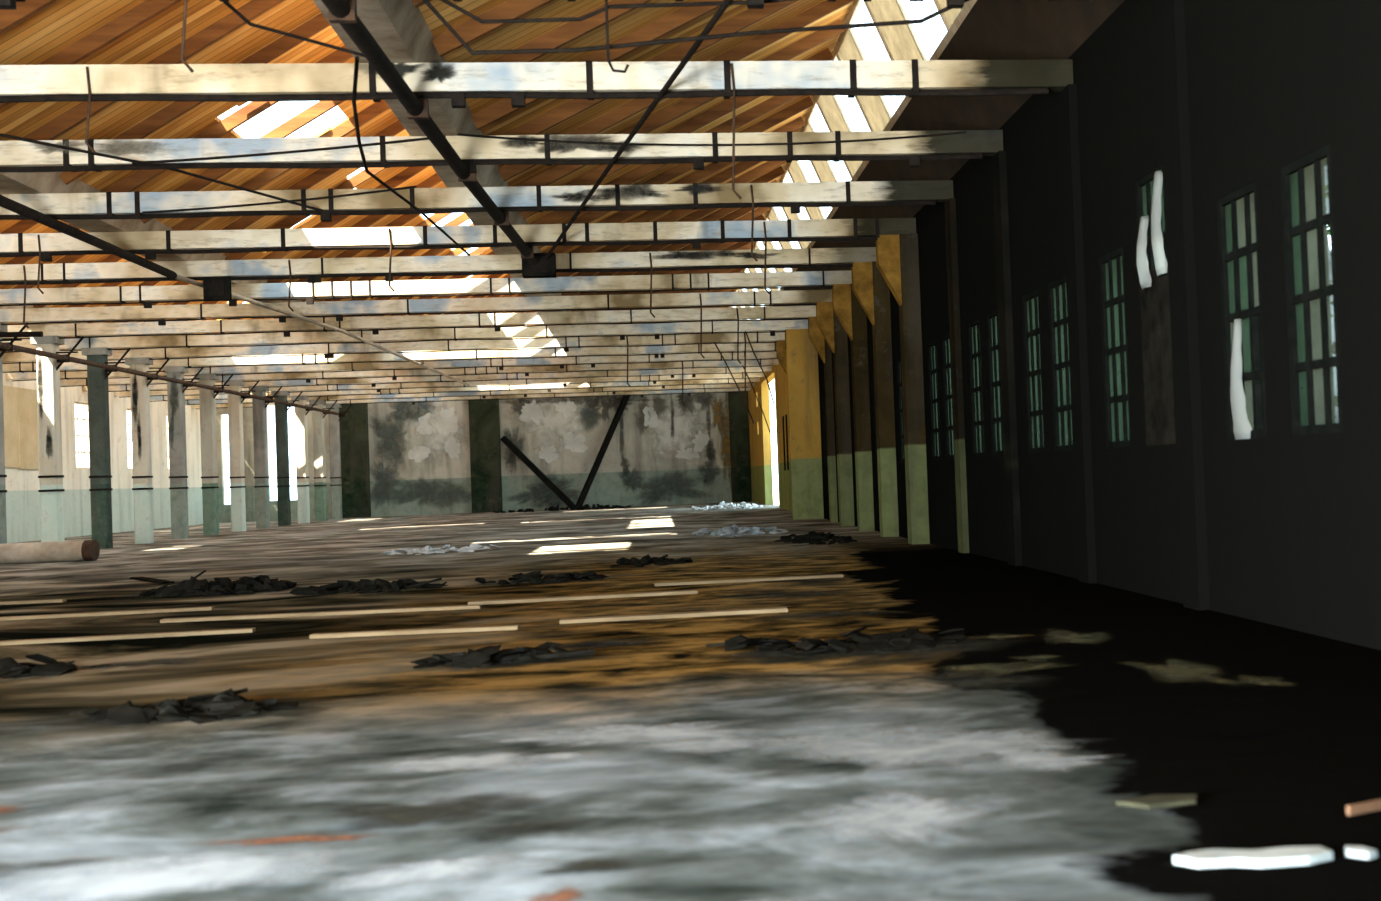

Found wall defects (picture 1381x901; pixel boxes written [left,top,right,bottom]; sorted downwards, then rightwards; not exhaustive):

water stain [370,401,470,507]
water stain [504,392,719,508]